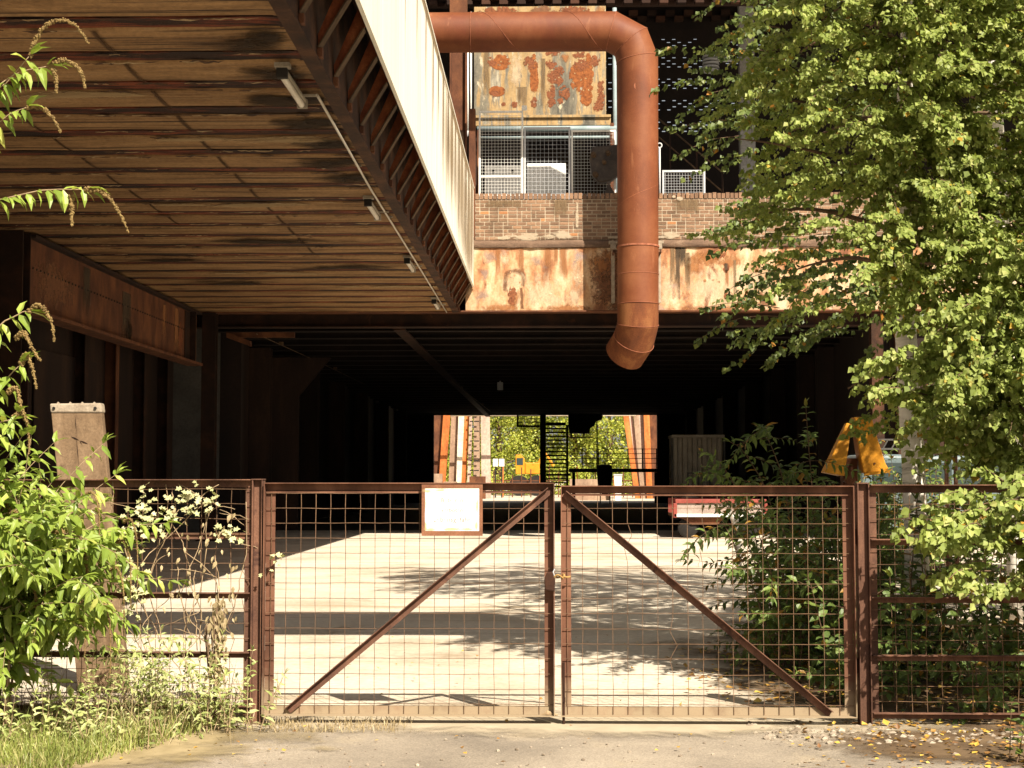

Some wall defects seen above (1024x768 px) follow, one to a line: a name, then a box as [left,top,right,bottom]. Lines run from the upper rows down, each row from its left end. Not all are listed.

leakage [220,29,284,53]
rust [486,52,605,112]
leakage [21,64,369,254]
leakage [199,265,390,285]
rust [545,248,567,273]
rust [548,250,617,310]